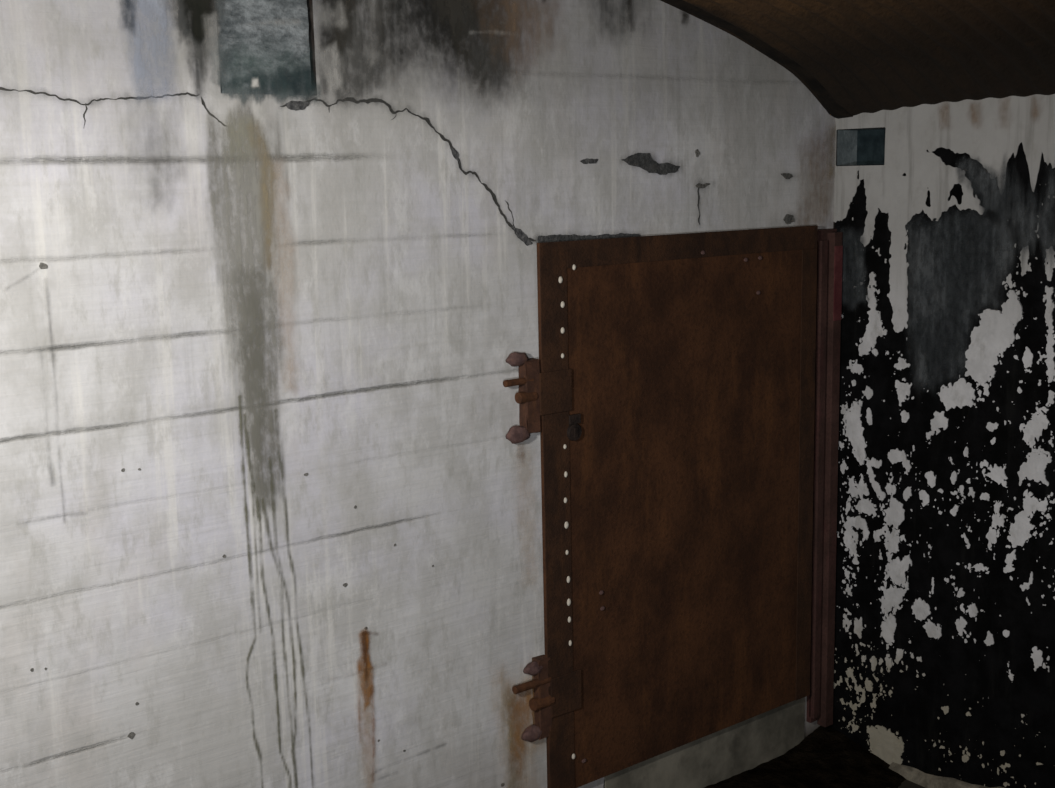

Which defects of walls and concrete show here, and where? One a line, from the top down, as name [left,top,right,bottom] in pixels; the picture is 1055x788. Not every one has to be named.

damp [320,0,539,97]
crack [0,87,226,126]
crack [280,97,536,246]
spalling [621,153,680,175]
damp [209,109,307,786]
peeling [833,94,1055,765]
rust [358,631,373,708]
peeling [925,714,1040,788]